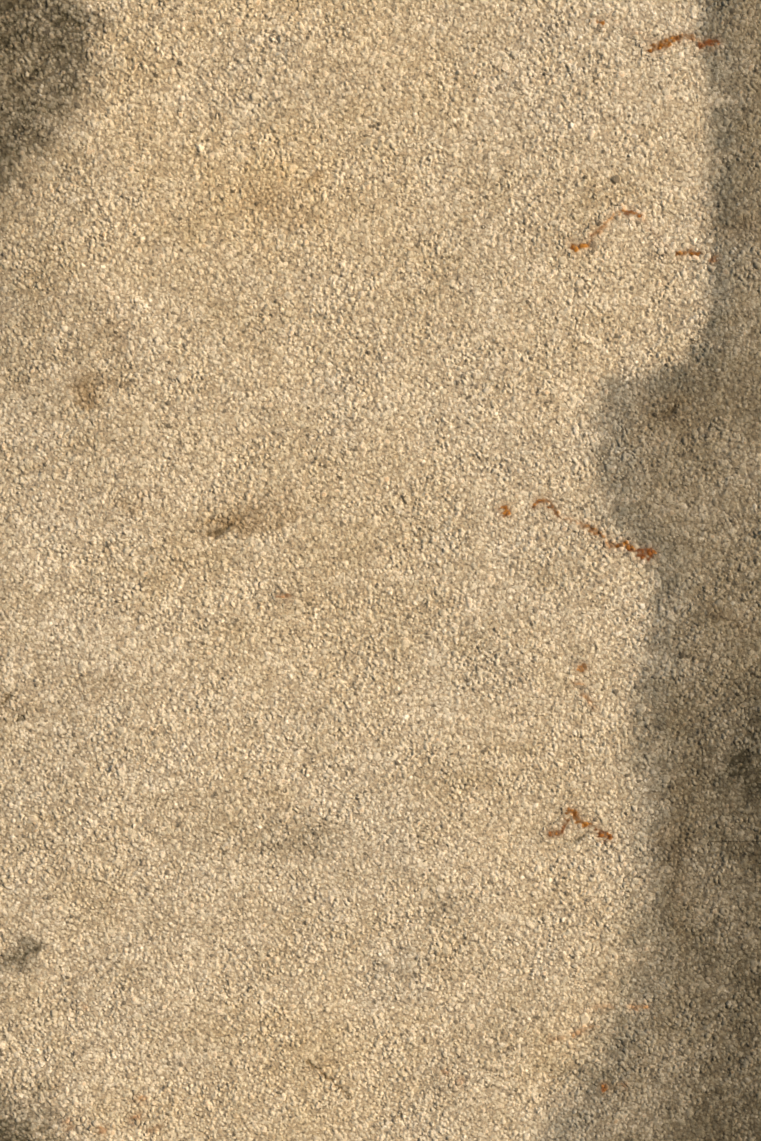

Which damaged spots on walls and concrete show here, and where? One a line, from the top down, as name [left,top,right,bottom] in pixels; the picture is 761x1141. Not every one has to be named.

corrosion [589,10,727,62]
damp [0,0,151,415]
corrosion [560,203,725,271]
damp [91,487,168,533]
corrosion [493,490,662,568]
damp [0,661,131,739]
corrosion [539,801,620,849]
damp [0,912,58,995]
damp [0,1065,102,1141]